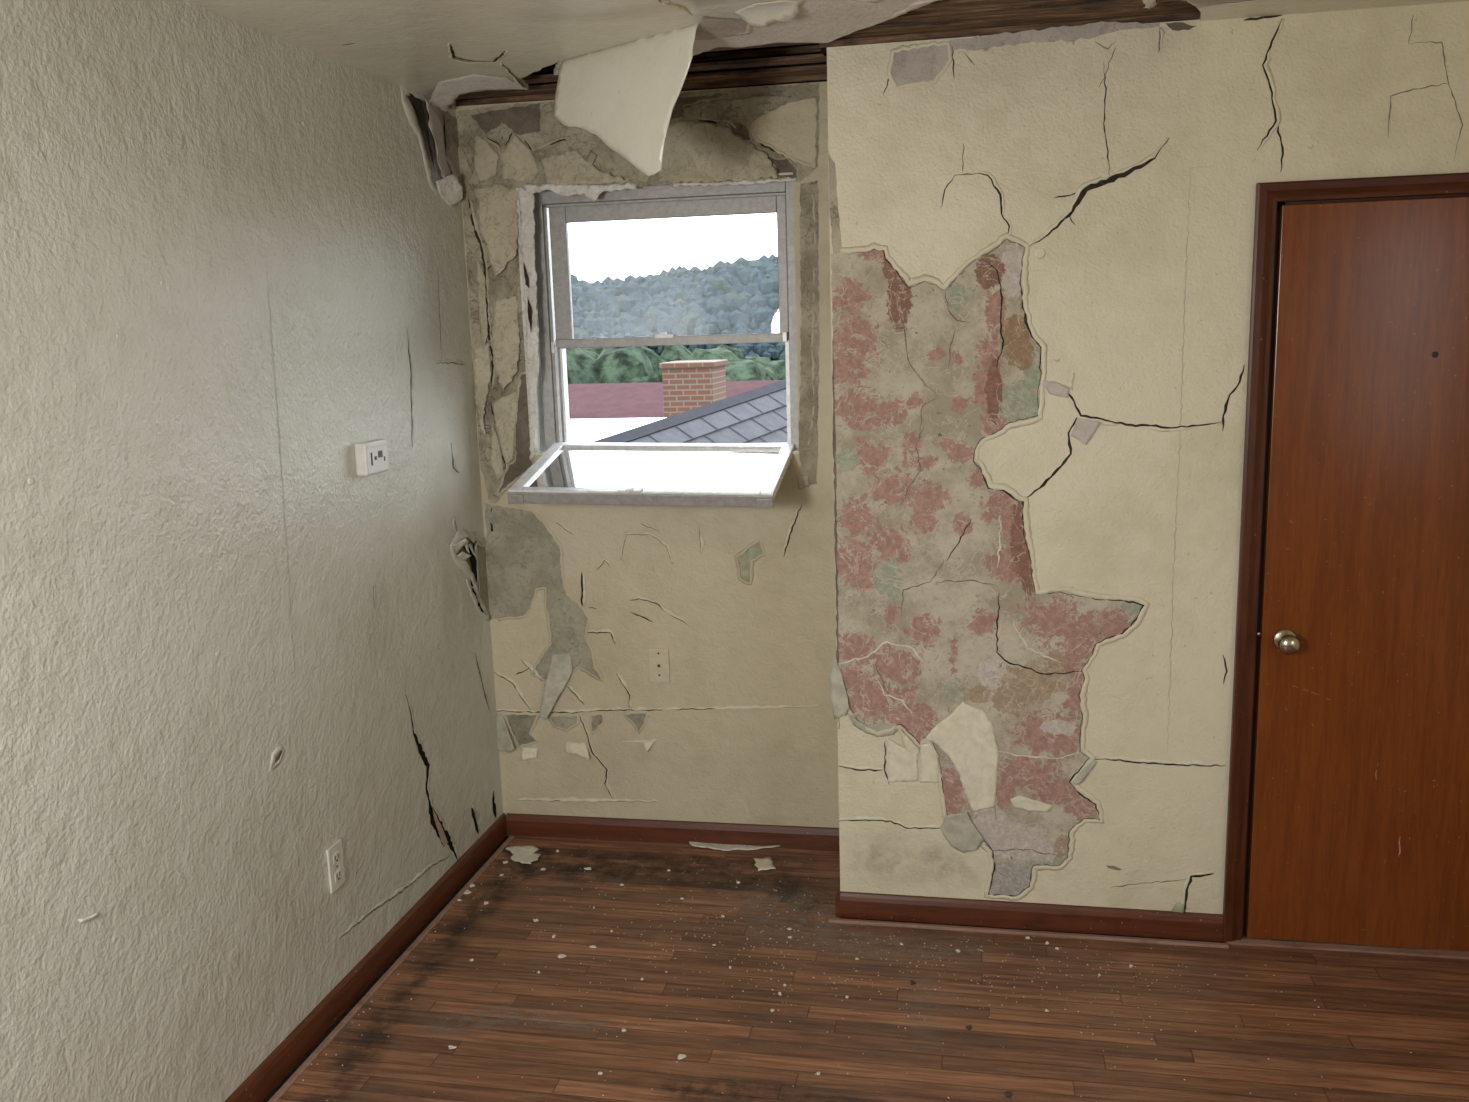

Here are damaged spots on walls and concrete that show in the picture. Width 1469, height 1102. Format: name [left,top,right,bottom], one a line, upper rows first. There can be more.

crack [658,0,693,16]
crack [1154,0,1165,53]
crack [1244,15,1284,172]
crack [1388,15,1463,158]
peeling [400,0,1195,901]
crack [941,41,1244,767]
crack [339,504,819,939]